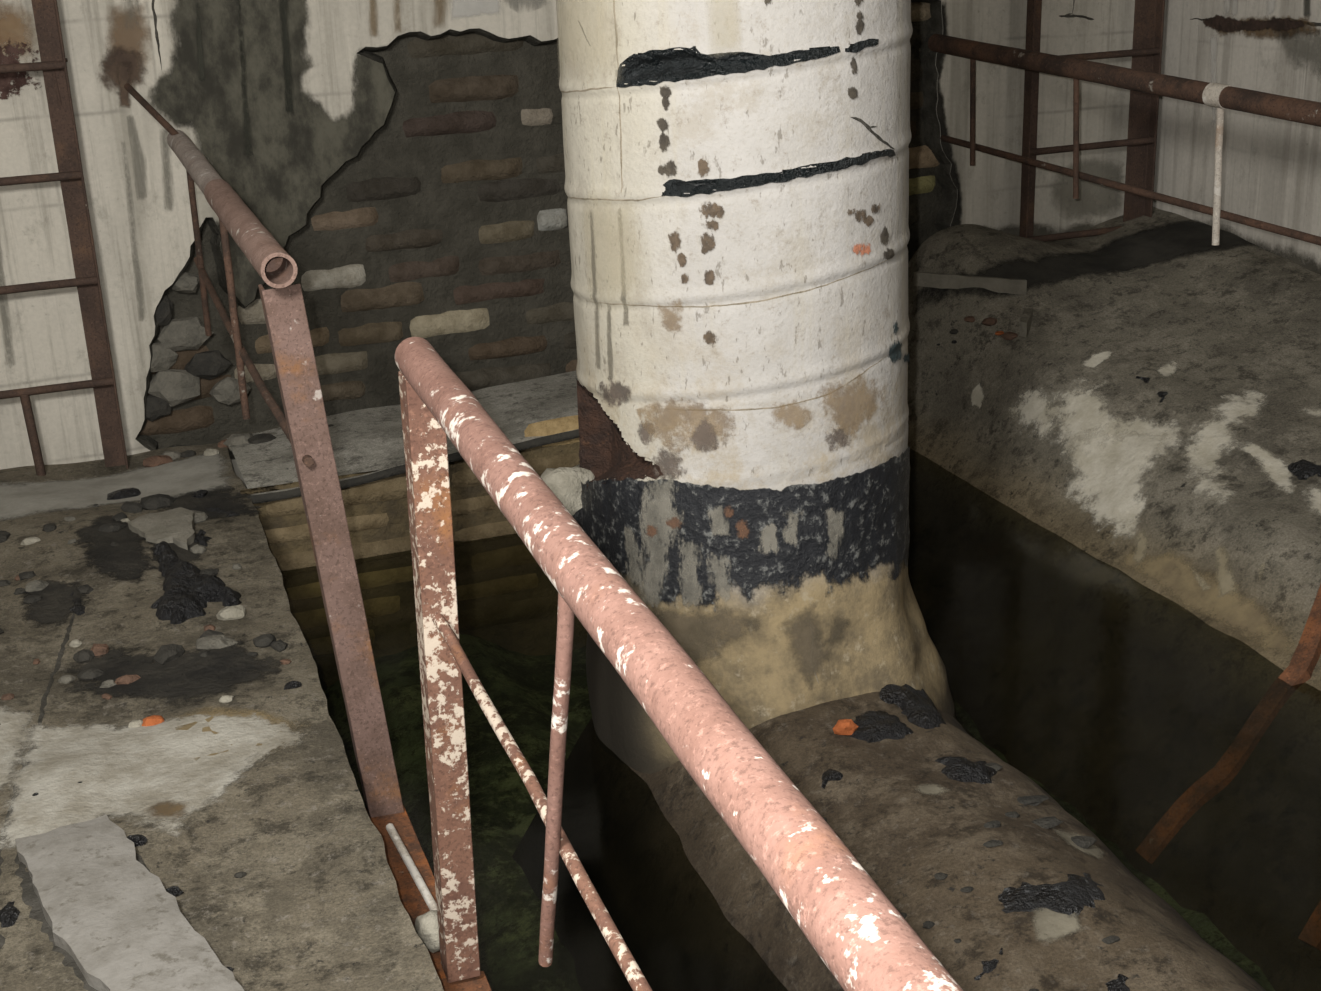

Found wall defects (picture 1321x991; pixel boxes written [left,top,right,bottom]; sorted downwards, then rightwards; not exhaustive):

corrosion [0,8,42,100]
corrosion [101,9,149,107]
damp [150,0,395,248]
crack [578,0,895,197]
spalling [847,0,957,263]
damp [216,222,265,307]
spalling [283,28,664,492]
spalling [0,217,316,571]
spalling [338,470,411,560]
spalling [448,451,516,542]
damp [759,514,798,554]
damp [827,509,843,556]